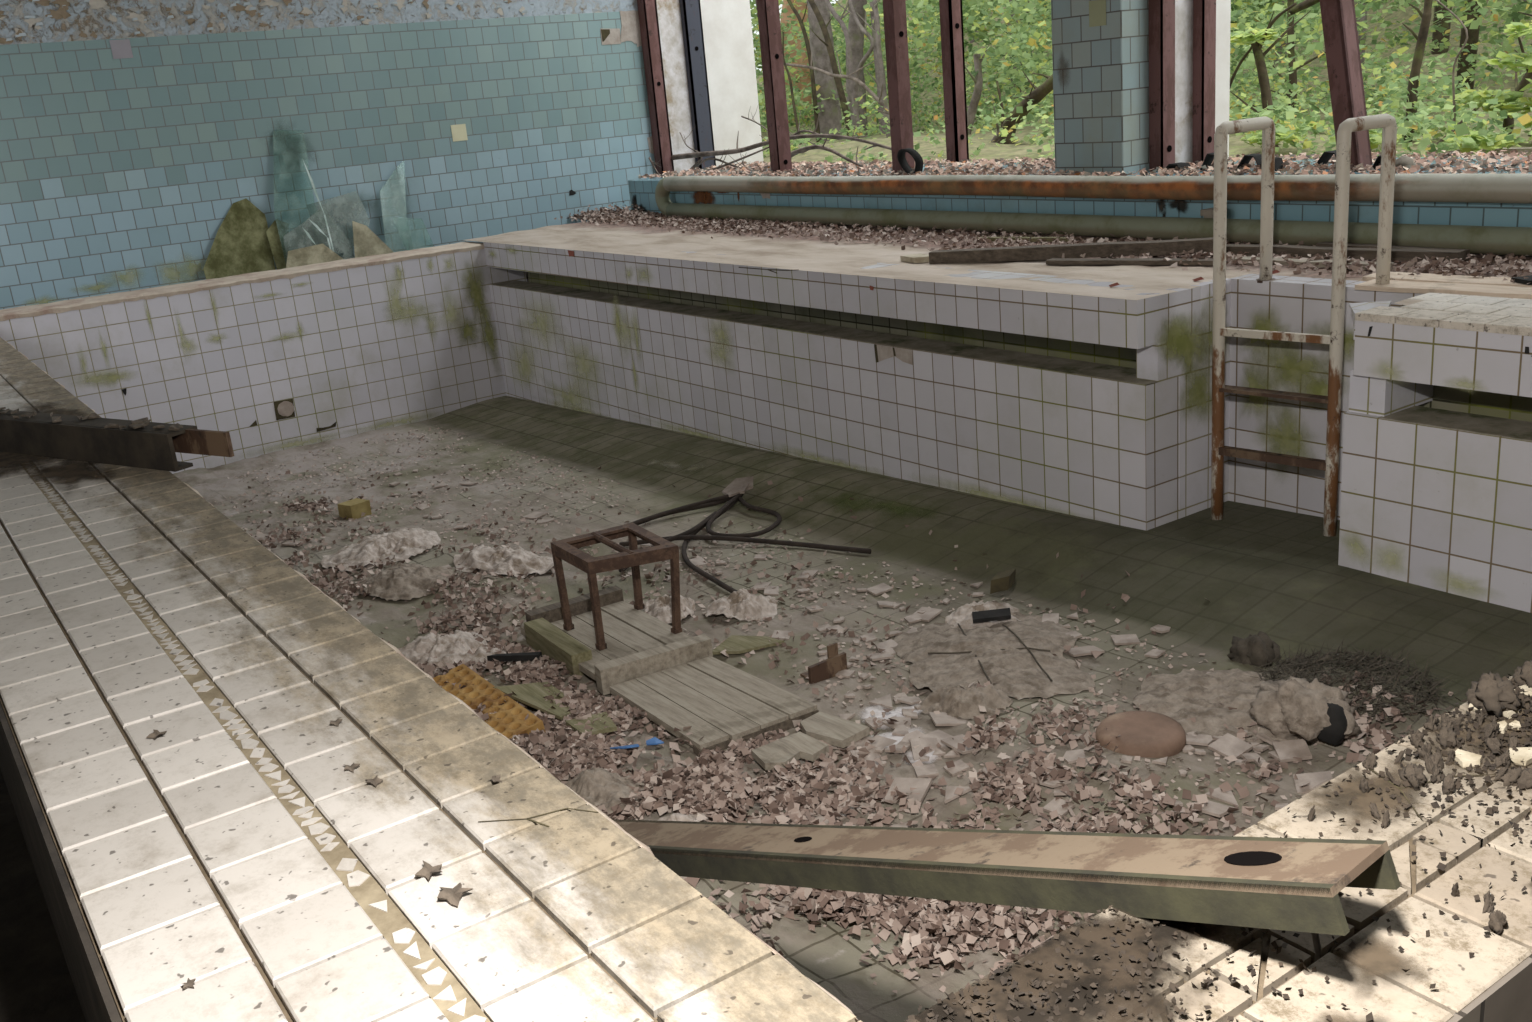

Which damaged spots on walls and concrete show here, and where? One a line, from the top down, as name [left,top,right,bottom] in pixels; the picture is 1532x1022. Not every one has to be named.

peeling [0,0,147,44]
peeling [165,0,313,33]
spalling [600,10,642,47]
peeling [274,399,295,420]